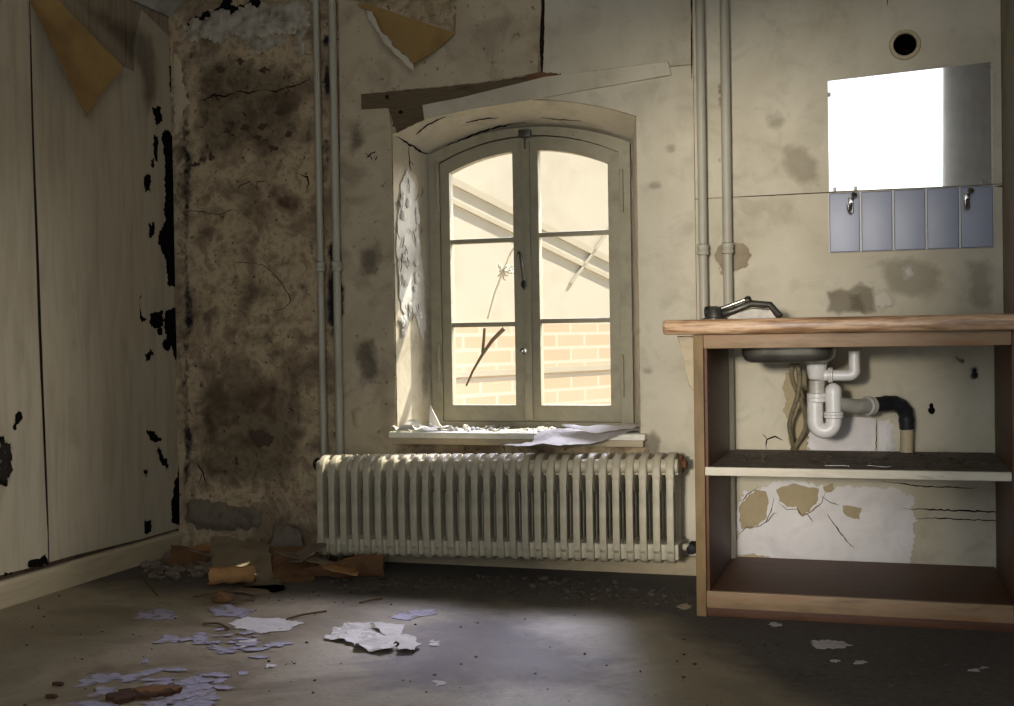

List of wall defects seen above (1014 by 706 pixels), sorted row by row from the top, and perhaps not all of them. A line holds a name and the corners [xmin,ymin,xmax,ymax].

peeling [144,54,189,287]
damp [183,110,206,217]
peeling [139,296,177,361]
damp [184,278,193,333]
damp [327,244,344,335]
peeling [394,170,426,341]
damp [829,286,894,312]
damp [184,423,192,482]
spalling [782,373,814,450]
peeling [736,479,918,563]